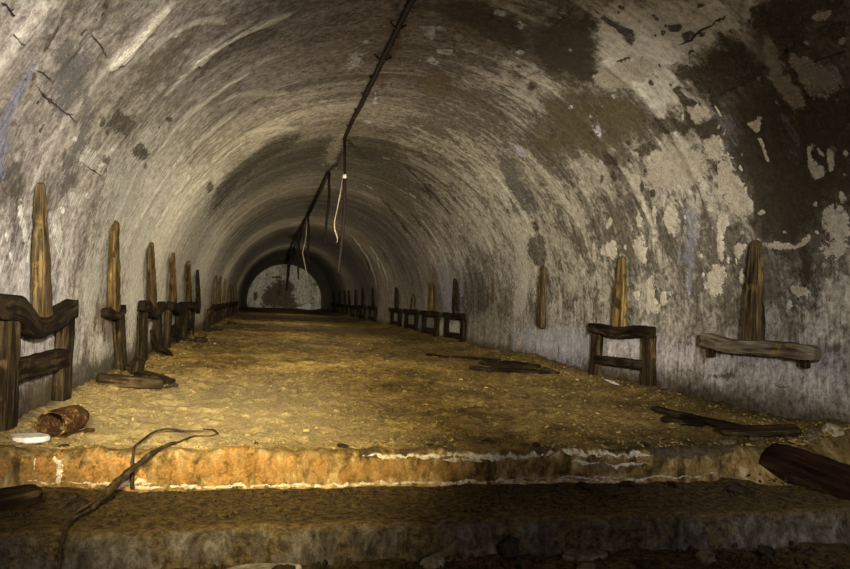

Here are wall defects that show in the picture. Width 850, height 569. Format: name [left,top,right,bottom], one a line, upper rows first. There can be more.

spalling [591,0,635,45]
crack [679,15,727,45]
spalling [747,5,807,102]
crack [36,70,76,122]
leakage [50,42,155,346]
peeling [591,14,769,297]
leakage [715,80,850,289]
peeling [807,143,848,180]
peeling [757,191,850,261]
peeling [633,275,668,316]
peeling [786,285,809,310]